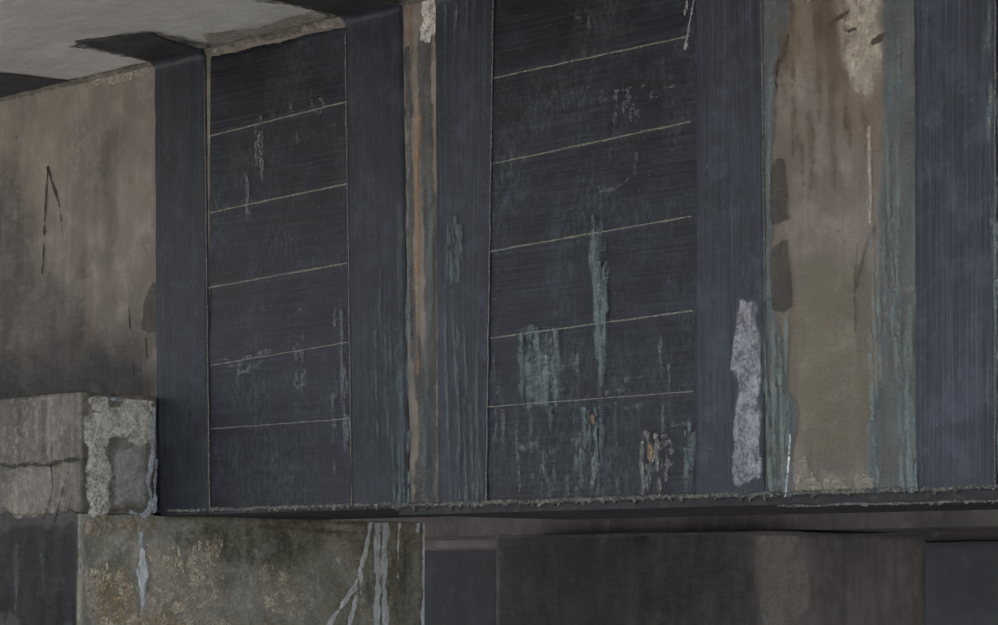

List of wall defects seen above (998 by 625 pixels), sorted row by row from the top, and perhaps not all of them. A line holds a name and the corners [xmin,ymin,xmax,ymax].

peeling [84,397,154,518]
water stain [327,522,401,625]
water stain [416,523,425,625]
water stain [389,31,467,503]
water stain [762,0,799,497]
water stain [813,0,918,493]